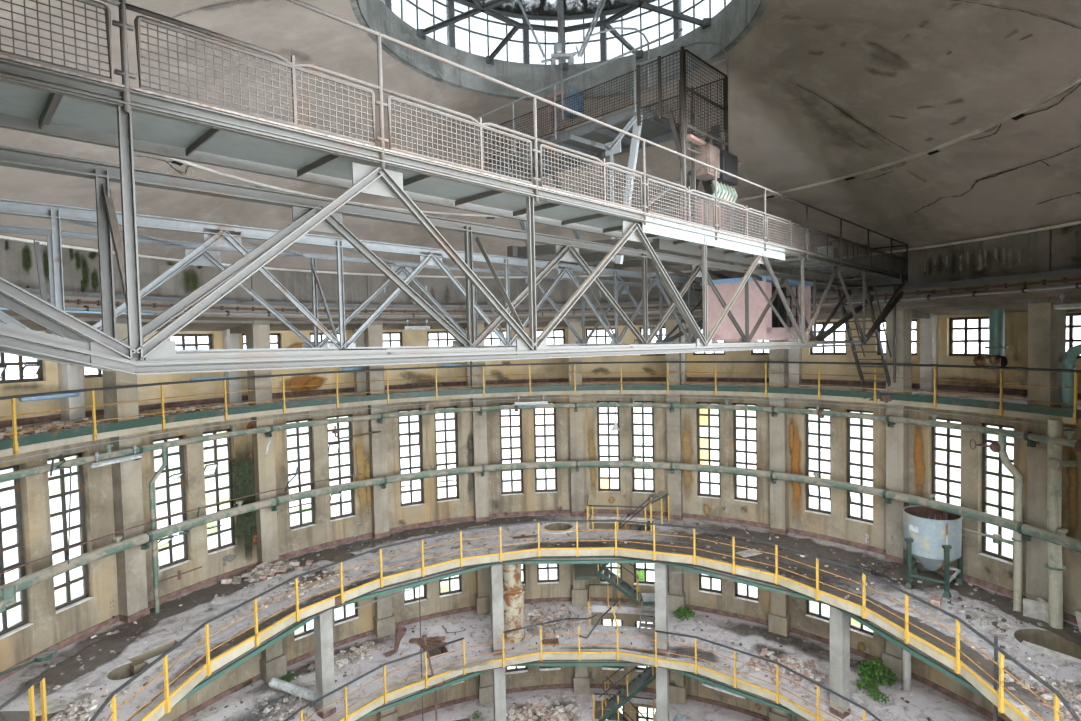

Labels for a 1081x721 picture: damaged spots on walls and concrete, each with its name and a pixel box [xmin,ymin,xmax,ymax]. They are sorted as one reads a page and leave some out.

crack [951,0,1081,29]
crack [796,84,910,180]
crack [1026,83,1081,115]
crack [915,145,1081,212]
water stain [230,446,257,554]
corrosion [355,439,372,510]
corrosion [789,421,801,509]
corrosion [914,428,924,489]